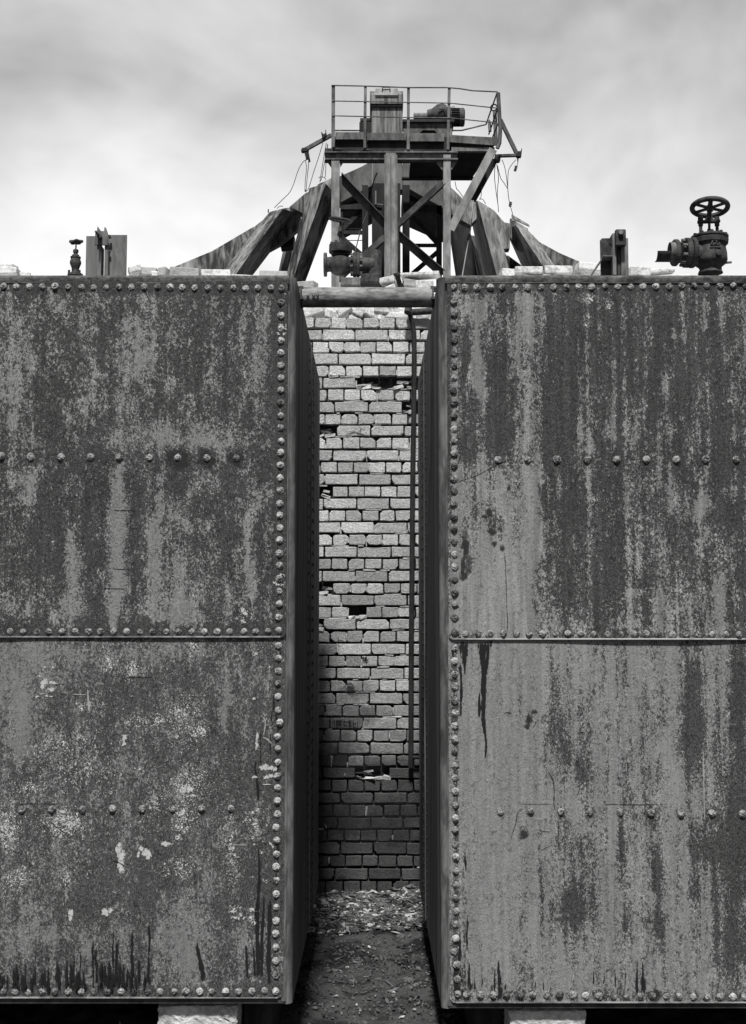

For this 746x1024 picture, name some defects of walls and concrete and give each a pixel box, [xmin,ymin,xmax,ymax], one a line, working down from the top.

spalling [356,379,411,391]
spalling [402,403,411,415]
spalling [320,427,337,438]
corrosion [166,448,215,468]
corrosion [482,508,504,551]
corrosion [460,540,469,580]
spalling [348,607,367,620]
spalling [355,767,391,780]